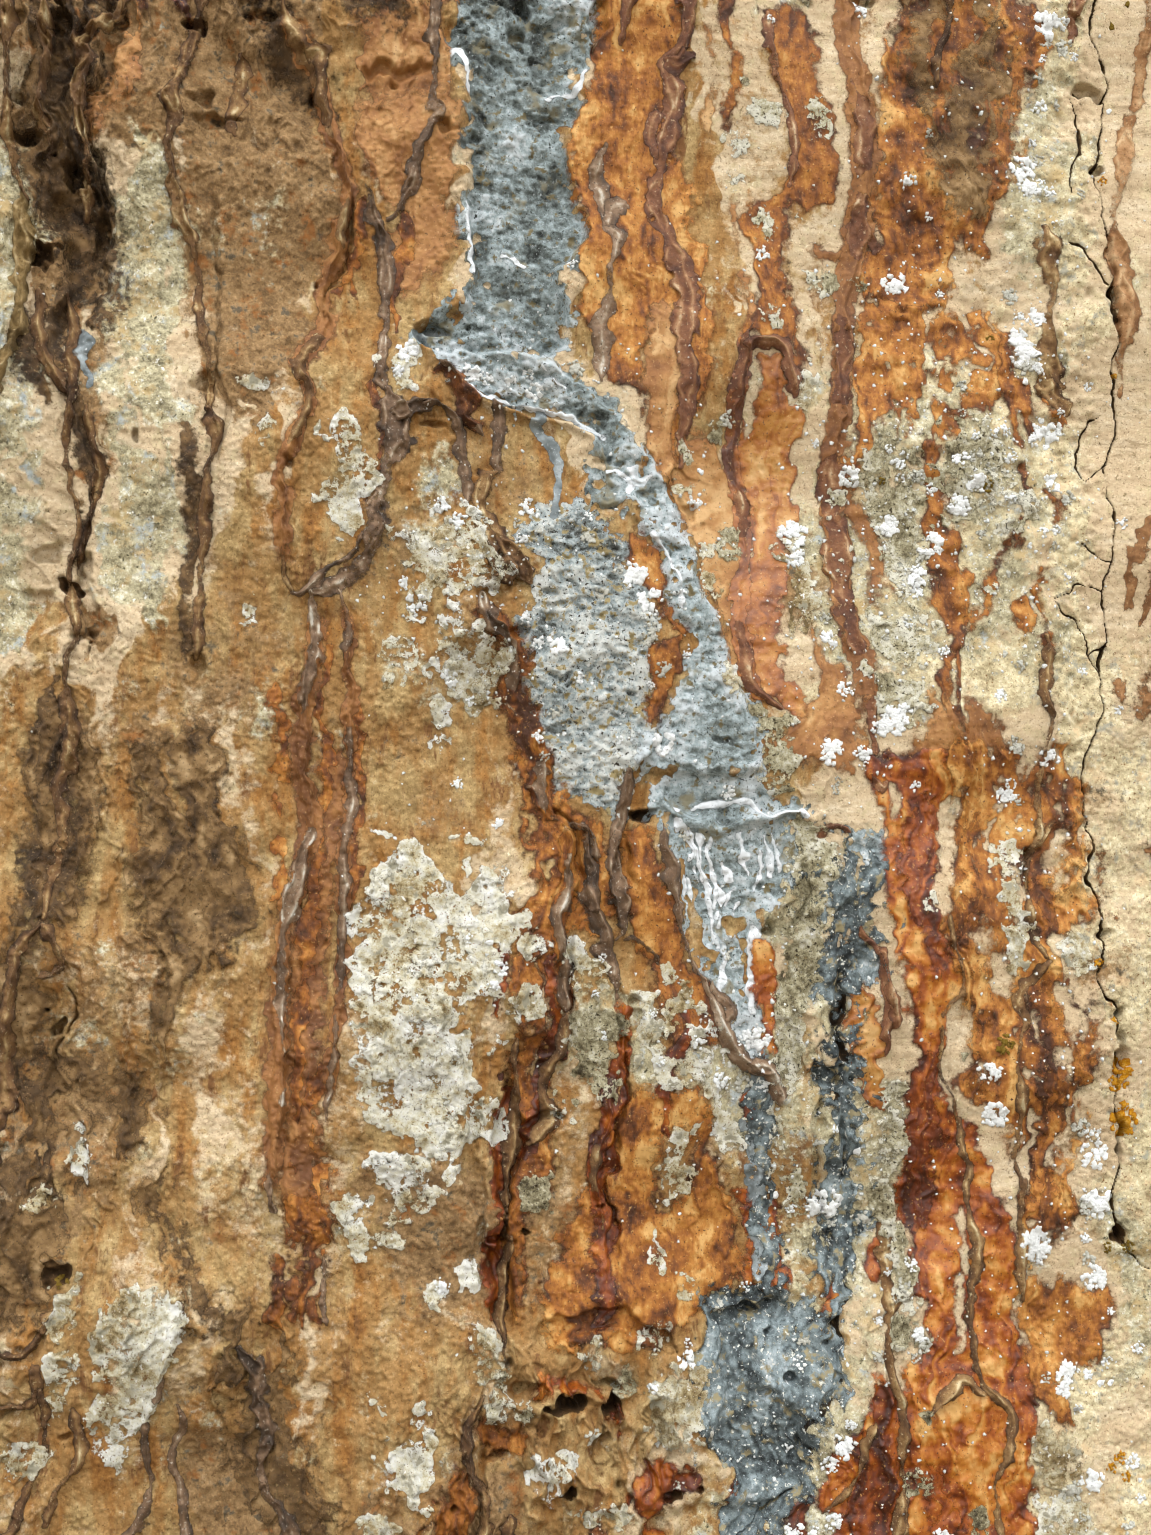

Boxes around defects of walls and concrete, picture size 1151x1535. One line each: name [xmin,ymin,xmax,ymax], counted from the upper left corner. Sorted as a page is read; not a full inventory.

leakage [0,0,912,1535]
corrosion [531,1371,624,1438]
corrosion [566,0,1119,1535]
crack [1054,0,1119,1126]
crack [1109,1162,1149,1269]